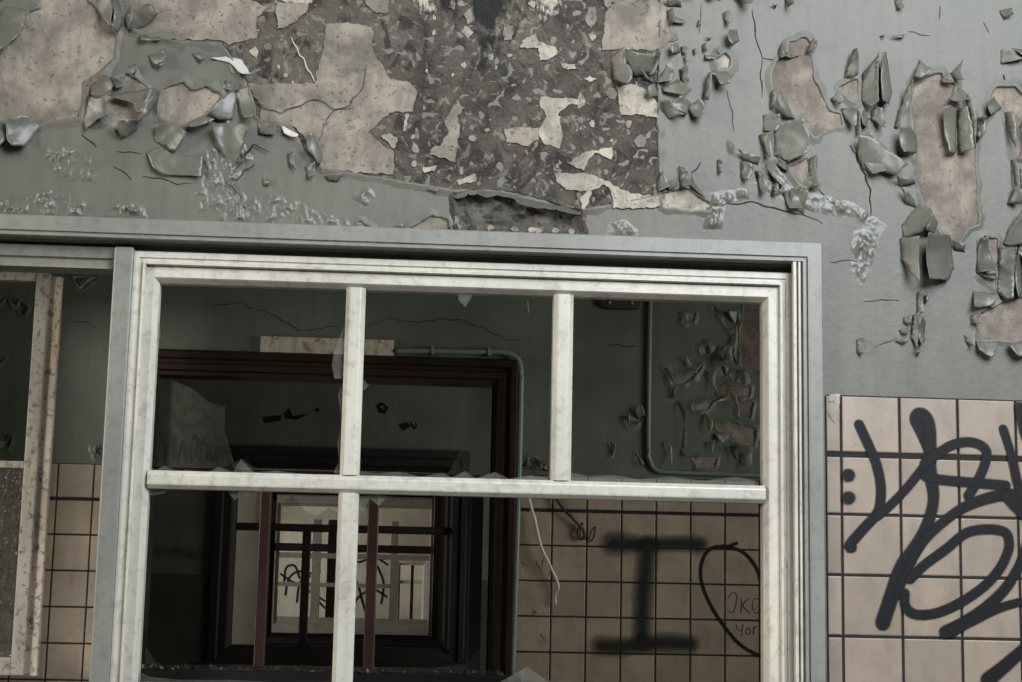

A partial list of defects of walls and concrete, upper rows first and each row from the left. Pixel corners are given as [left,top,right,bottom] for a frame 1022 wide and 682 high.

peeling [0,292,33,319]
spalling [0,0,739,234]
peeling [659,303,760,472]
peeling [736,30,1022,357]